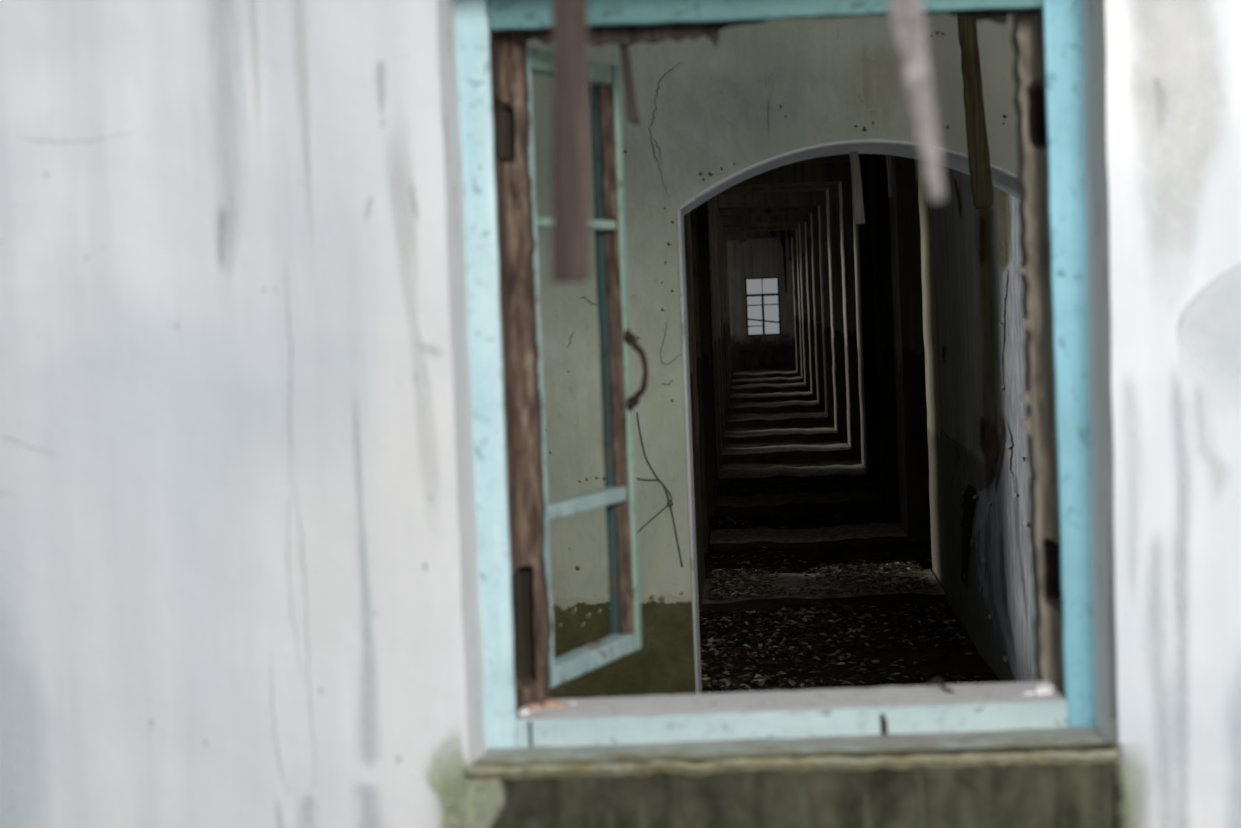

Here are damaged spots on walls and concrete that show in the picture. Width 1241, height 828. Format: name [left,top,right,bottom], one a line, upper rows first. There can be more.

crack [649,63,680,196]
damp [492,743,1123,828]